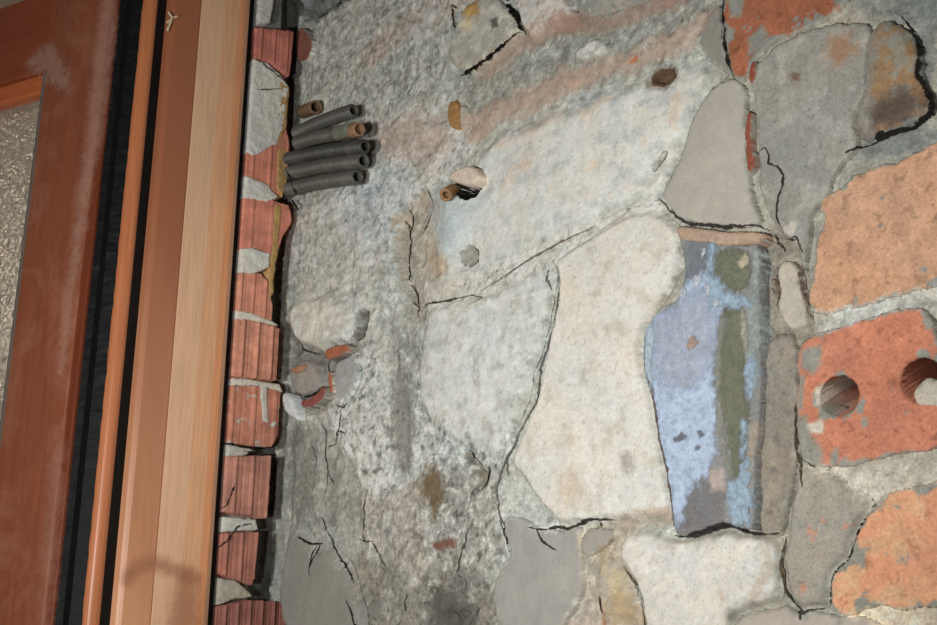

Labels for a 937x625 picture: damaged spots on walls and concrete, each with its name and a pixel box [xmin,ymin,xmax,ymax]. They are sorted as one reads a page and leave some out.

crack [461,0,526,76]
crack [722,0,734,78]
crack [845,16,936,153]
crack [644,337,825,620]
crack [298,518,372,625]
crack [359,496,388,570]